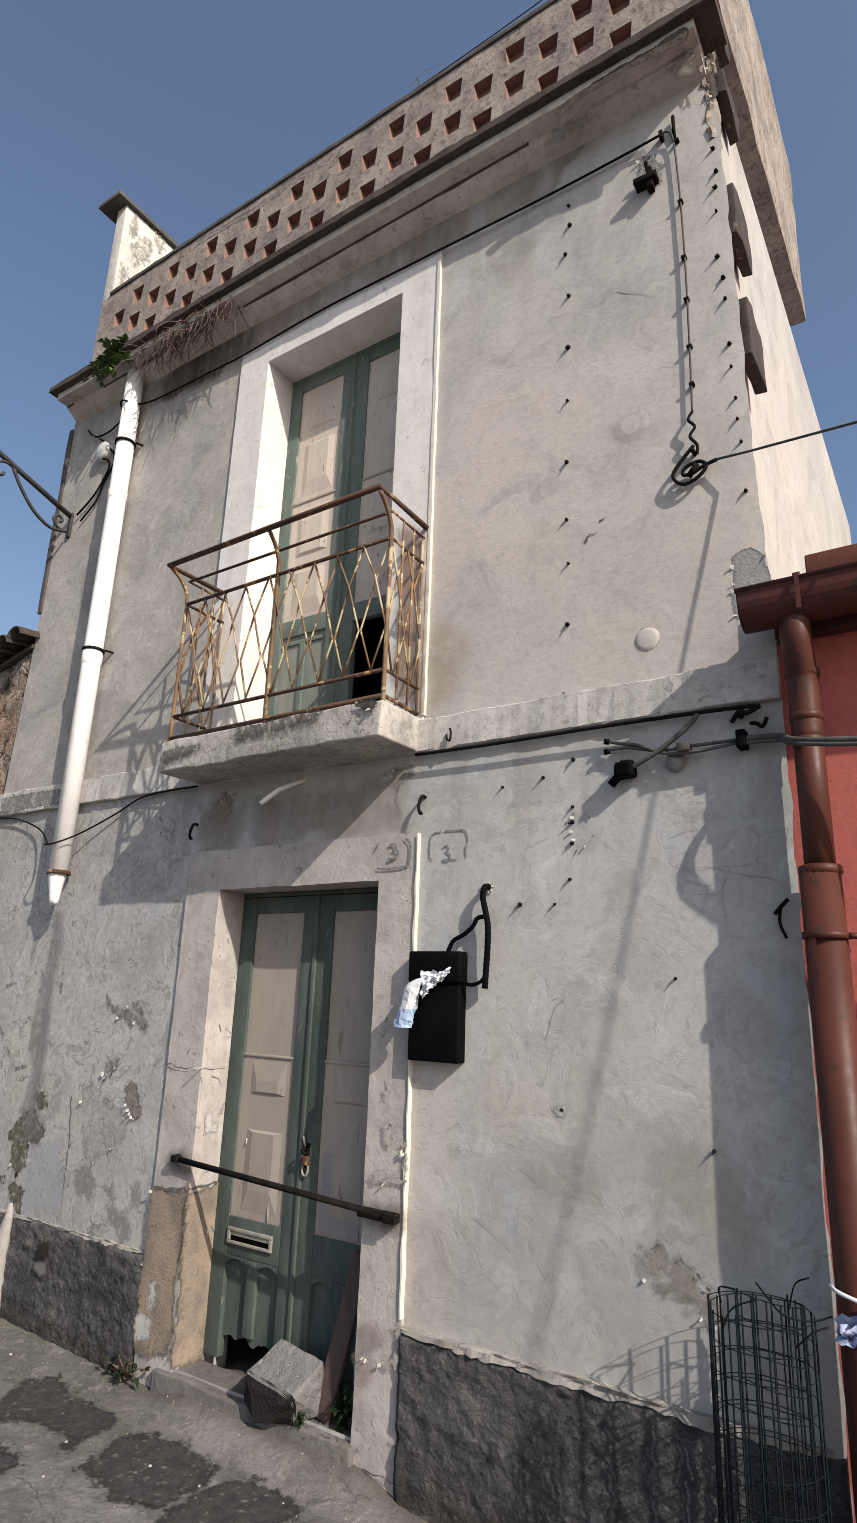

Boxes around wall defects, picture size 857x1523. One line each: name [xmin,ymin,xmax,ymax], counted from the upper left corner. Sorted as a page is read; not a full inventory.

spalling [729,547,774,619]
spalling [79,1059,142,1164]
spalling [133,1181,219,1370]
spalling [636,1243,727,1330]